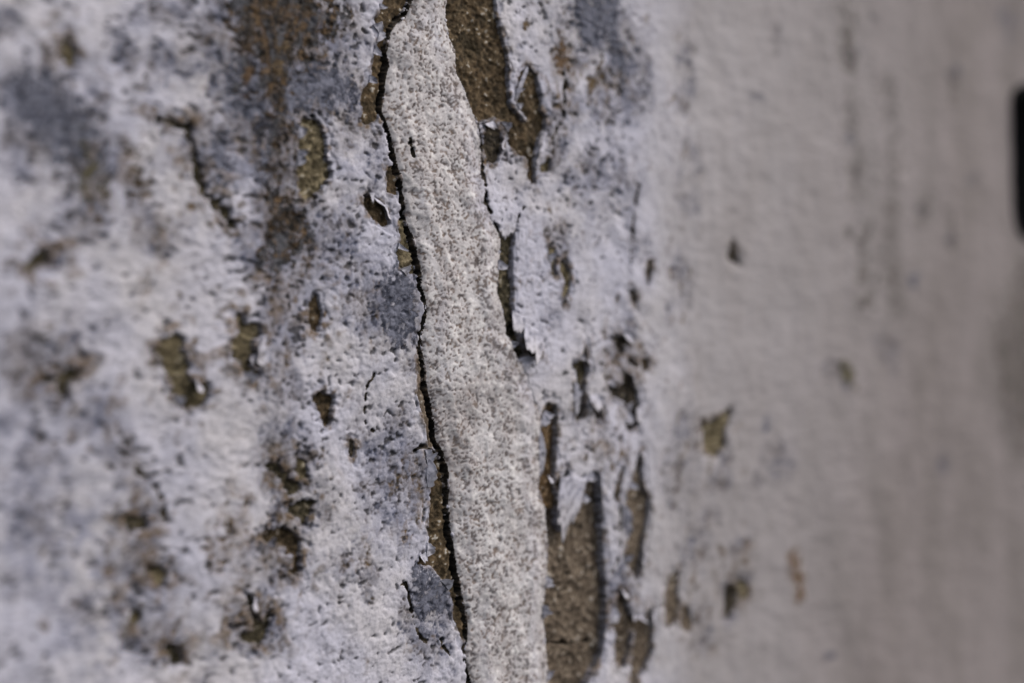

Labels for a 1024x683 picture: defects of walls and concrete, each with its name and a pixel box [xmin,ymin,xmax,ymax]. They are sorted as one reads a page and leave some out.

peeling [445,0,549,183]
spalling [585,51,606,95]
peeling [150,333,209,409]
spalling [255,116,331,278]
crack [375,0,471,683]
peeling [417,354,466,640]
crack [468,103,526,238]
peeling [497,210,543,366]
peeling [547,247,570,303]
peeling [573,333,648,430]
peeling [538,404,691,683]
spalling [700,408,729,458]